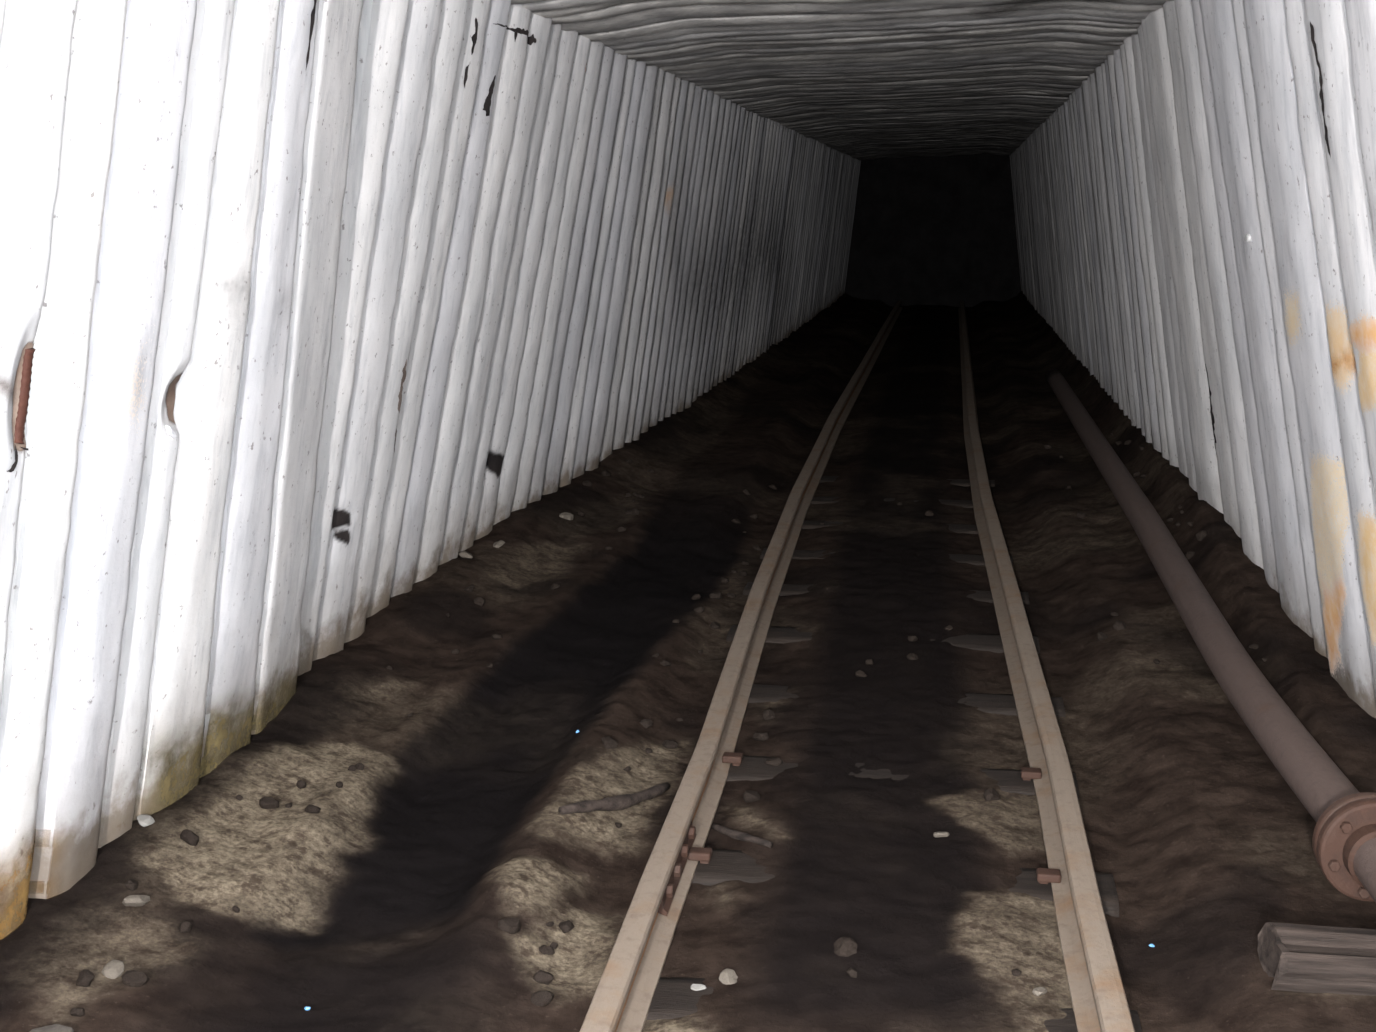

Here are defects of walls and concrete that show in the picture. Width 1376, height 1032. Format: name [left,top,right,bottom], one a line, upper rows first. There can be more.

crack [1310,22,1331,157]
rust [1323,295,1376,417]
rust [1308,447,1376,678]